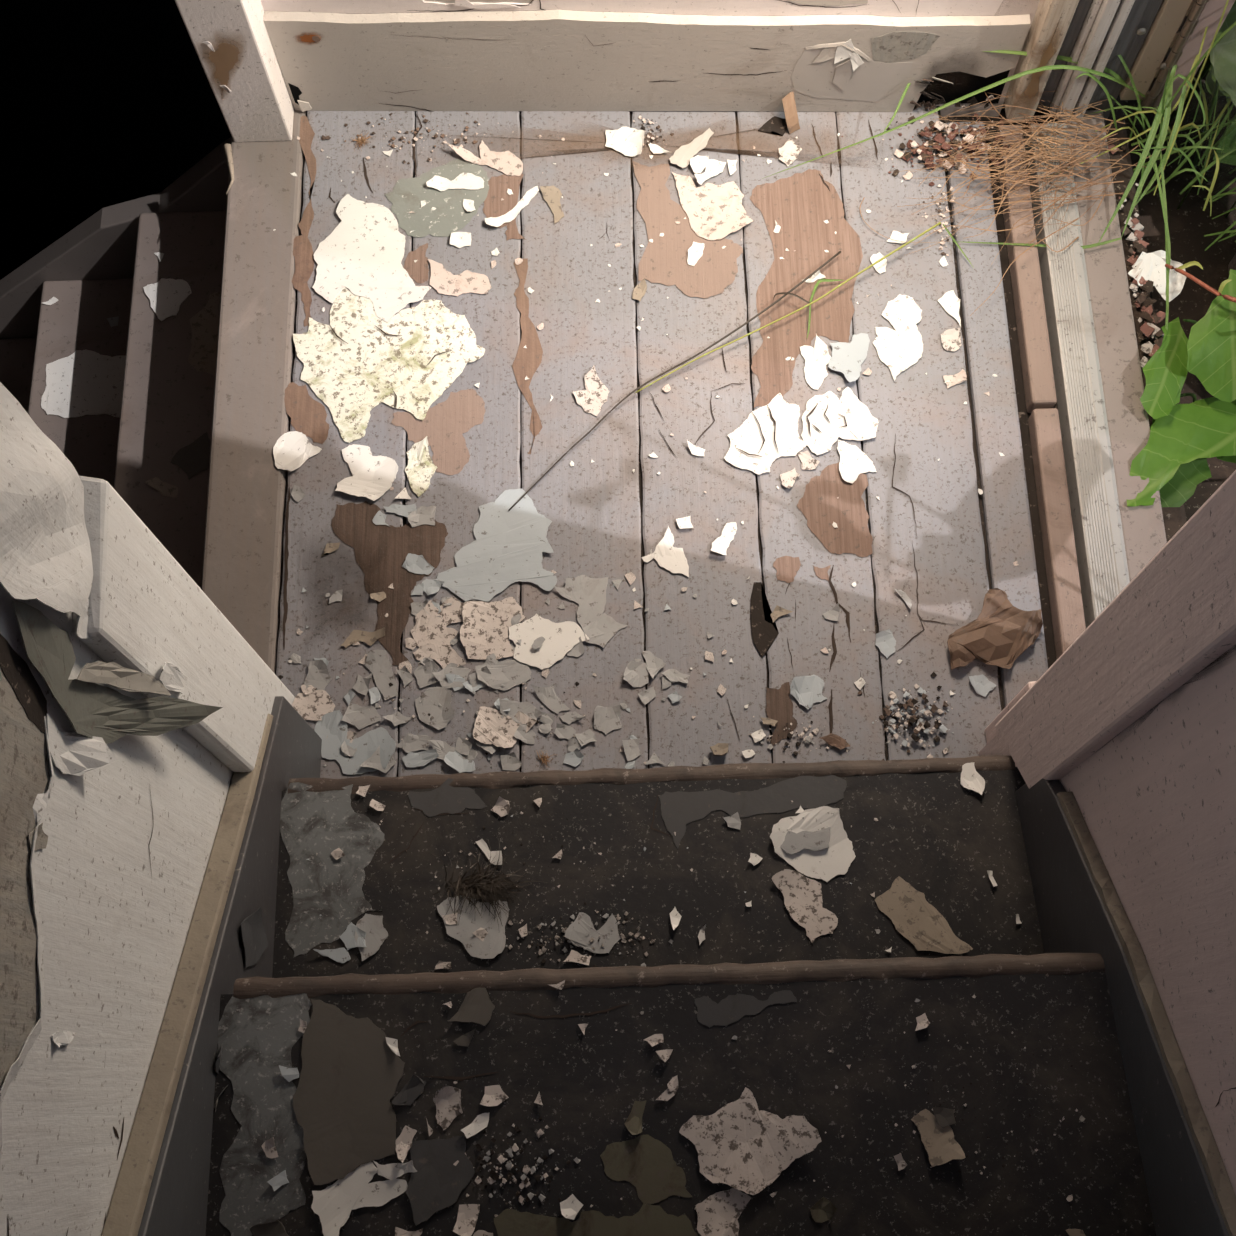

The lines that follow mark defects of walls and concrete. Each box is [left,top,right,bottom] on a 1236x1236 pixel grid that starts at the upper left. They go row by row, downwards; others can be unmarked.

crack [402,9,515,40]
crack [779,0,861,8]
peeling [446,133,564,227]
peeling [605,126,802,266]
peeling [293,171,500,527]
peeling [724,231,927,490]
peeling [273,431,322,502]
peeling [288,489,733,775]
crack [828,565,851,733]
peeling [770,800,856,943]
peeling [279,999,509,1236]
peeling [679,1087,821,1236]